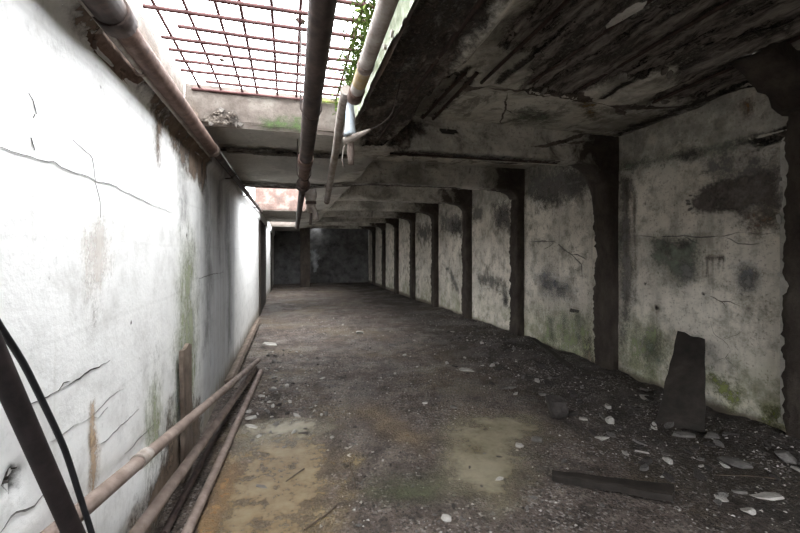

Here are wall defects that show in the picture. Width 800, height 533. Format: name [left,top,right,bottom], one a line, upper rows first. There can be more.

spalling [86,25,143,84]
crack [463,86,684,124]
spalling [354,0,800,164]
crack [0,138,171,218]
crack [531,240,587,286]
damp [651,235,701,283]
crack [31,360,110,404]
damp [148,364,180,443]
damp [180,255,202,449]
spalling [1,464,19,489]
rust [89,401,98,491]
damp [126,434,181,533]